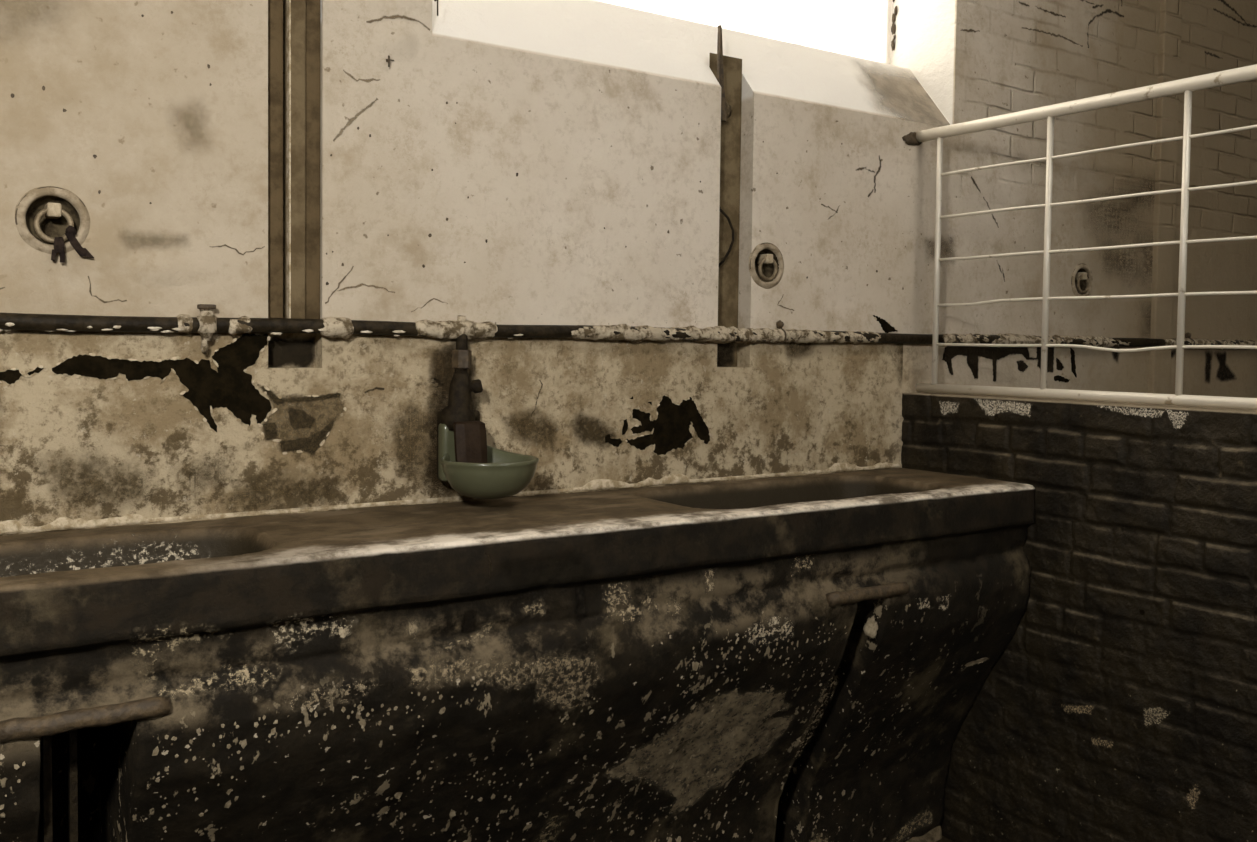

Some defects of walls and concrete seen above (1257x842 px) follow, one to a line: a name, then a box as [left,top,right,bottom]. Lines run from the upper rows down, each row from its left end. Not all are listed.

crack [366,15,430,31]
crack [1019,0,1124,48]
crack [333,71,380,141]
crack [325,267,448,312]
water stain [942,333,1131,383]
flaking render [0,332,347,454]
flaking render [605,395,711,457]
water stain [51,461,147,500]
water stain [235,480,331,507]
spalling [597,616,846,842]
peeling [211,722,247,808]
peeling [385,753,533,842]